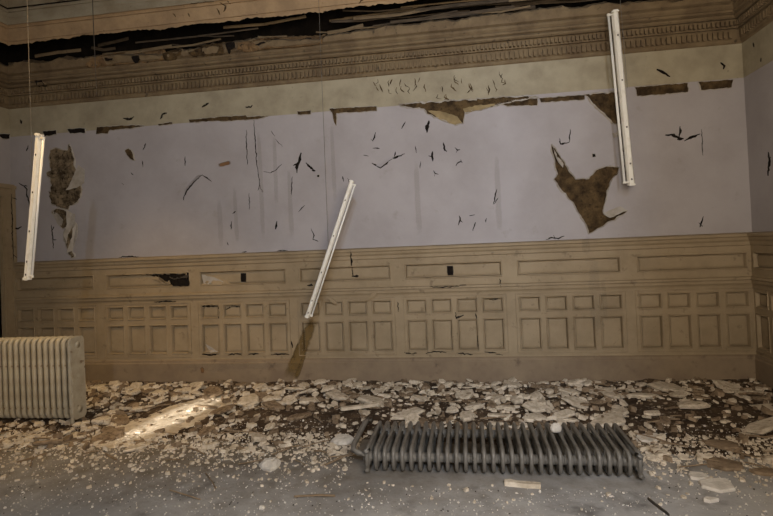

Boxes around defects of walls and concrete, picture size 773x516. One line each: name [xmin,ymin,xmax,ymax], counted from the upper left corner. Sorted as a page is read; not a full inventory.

peeling [85,34,326,68]
peeling [399,95,539,126]
peeling [584,90,622,138]
peeling [46,143,85,259]
crack [183,159,212,200]
peeling [550,143,627,234]